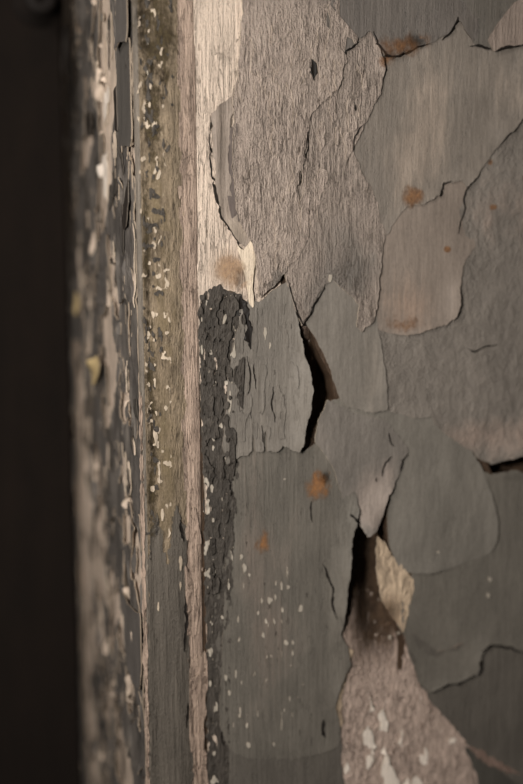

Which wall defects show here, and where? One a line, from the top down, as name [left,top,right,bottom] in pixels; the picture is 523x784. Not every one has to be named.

crack [340,17,458,57]
crack [470,44,523,52]
crack [208,119,240,247]
crack [439,181,467,234]
crack [287,279,325,326]
peeling [62,0,202,784]
crack [236,296,275,441]
peeling [188,0,523,784]
crack [375,434,408,481]
crack [322,564,337,619]
crack [432,644,523,693]